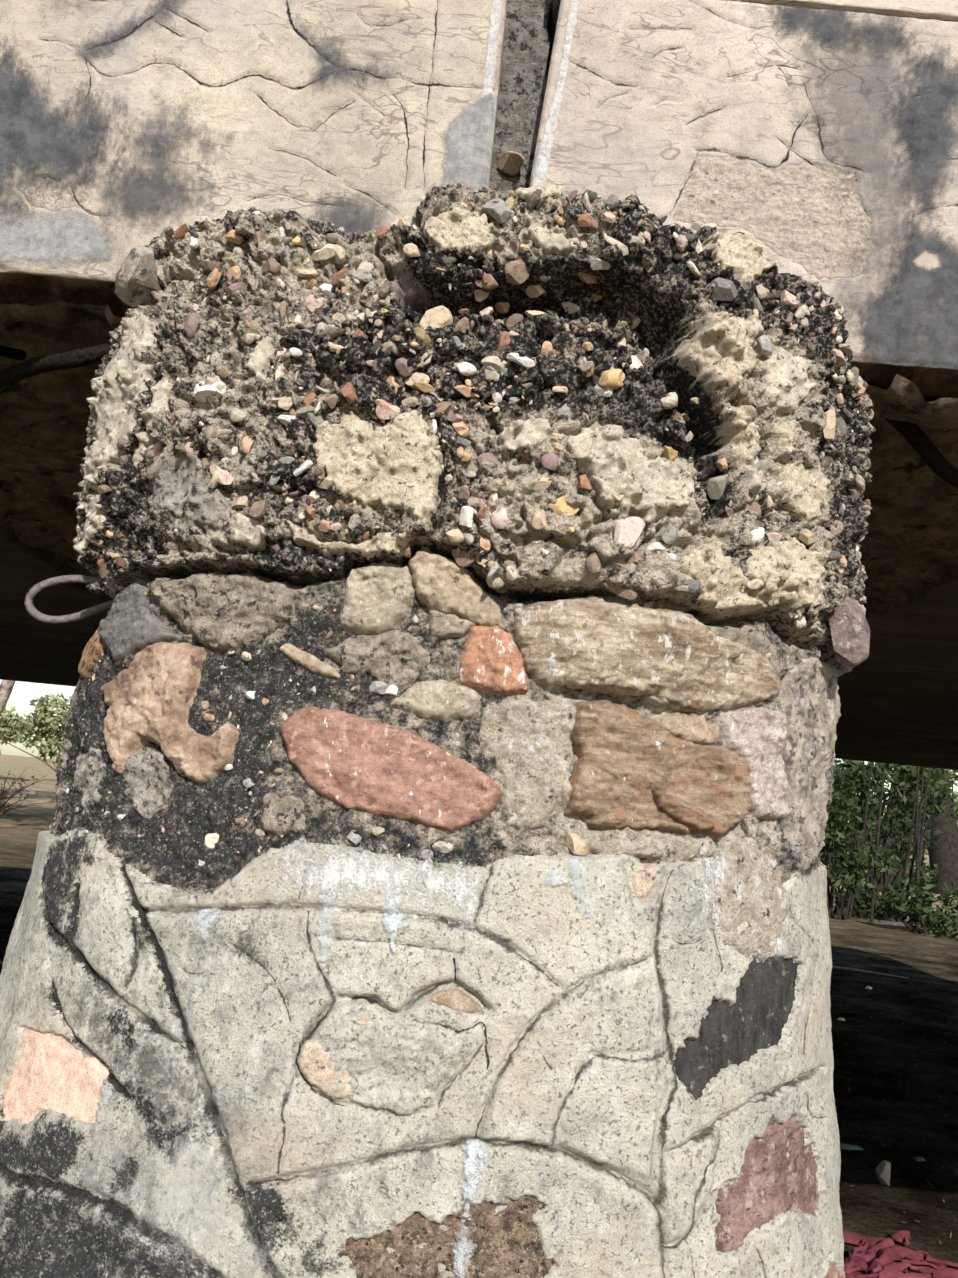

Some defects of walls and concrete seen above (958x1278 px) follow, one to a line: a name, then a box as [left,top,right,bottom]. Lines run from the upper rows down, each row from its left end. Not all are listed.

leakage [0,42,202,223]
leakage [80,21,138,58]
crack [85,1,494,211]
leakage [312,43,377,83]
crack [571,61,631,108]
crack [630,7,722,56]
crack [657,65,868,214]
leakage [778,4,906,46]
leakage [893,50,958,212]
leakage [319,200,379,236]
spalling [672,156,872,280]
leakage [860,223,958,369]